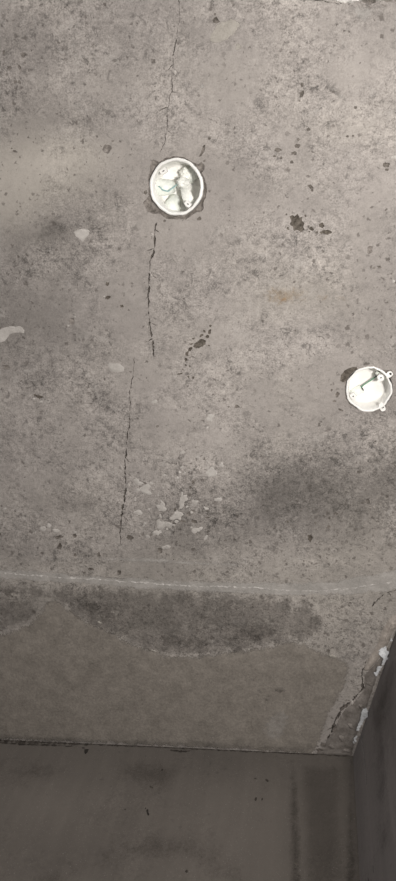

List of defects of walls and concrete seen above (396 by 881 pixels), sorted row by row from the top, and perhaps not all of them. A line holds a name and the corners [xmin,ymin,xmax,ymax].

crack [160,0,180,152]
crack [118,223,159,544]
peeling [0,601,389,756]